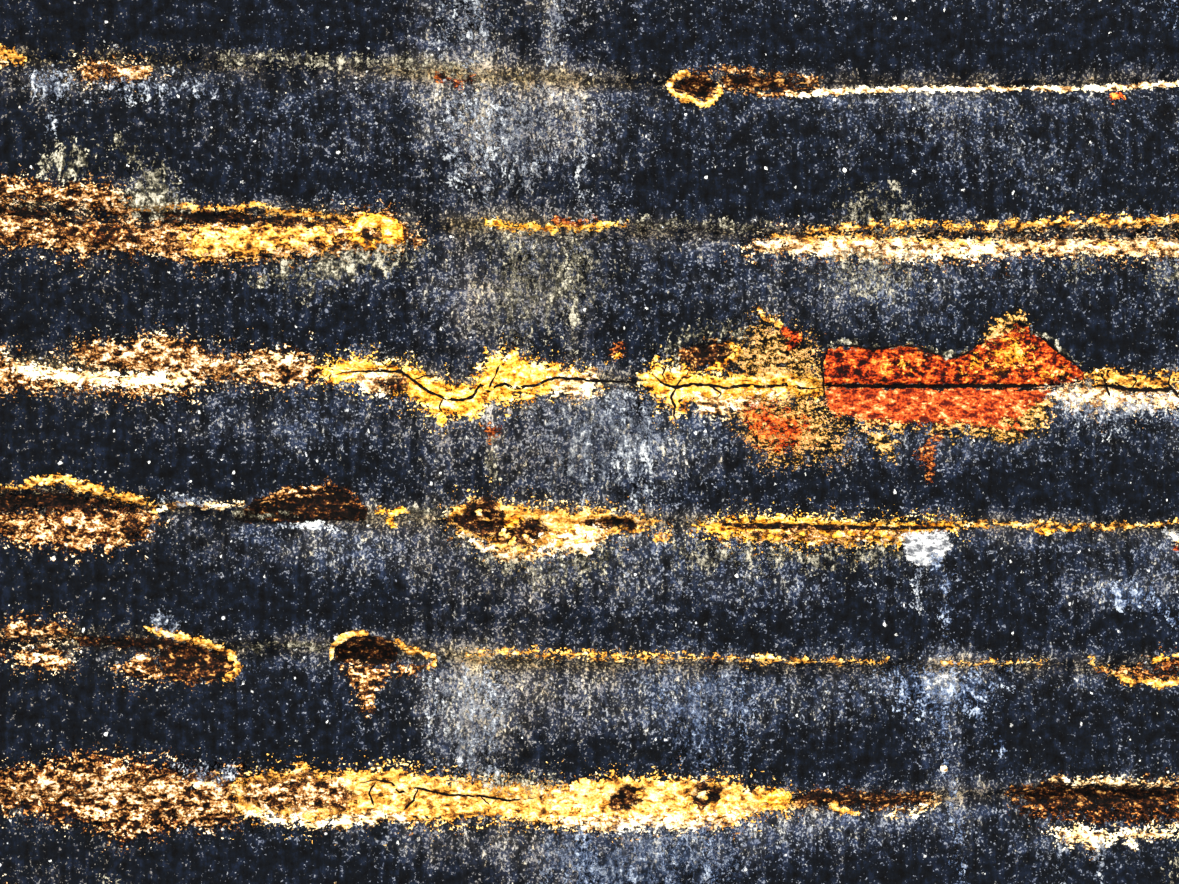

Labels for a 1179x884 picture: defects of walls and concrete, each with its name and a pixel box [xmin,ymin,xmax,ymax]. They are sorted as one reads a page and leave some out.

peeling [723,180,1031,304]
crack [336,365,823,417]
rust [0,323,1179,592]
peeling [1032,806,1124,841]